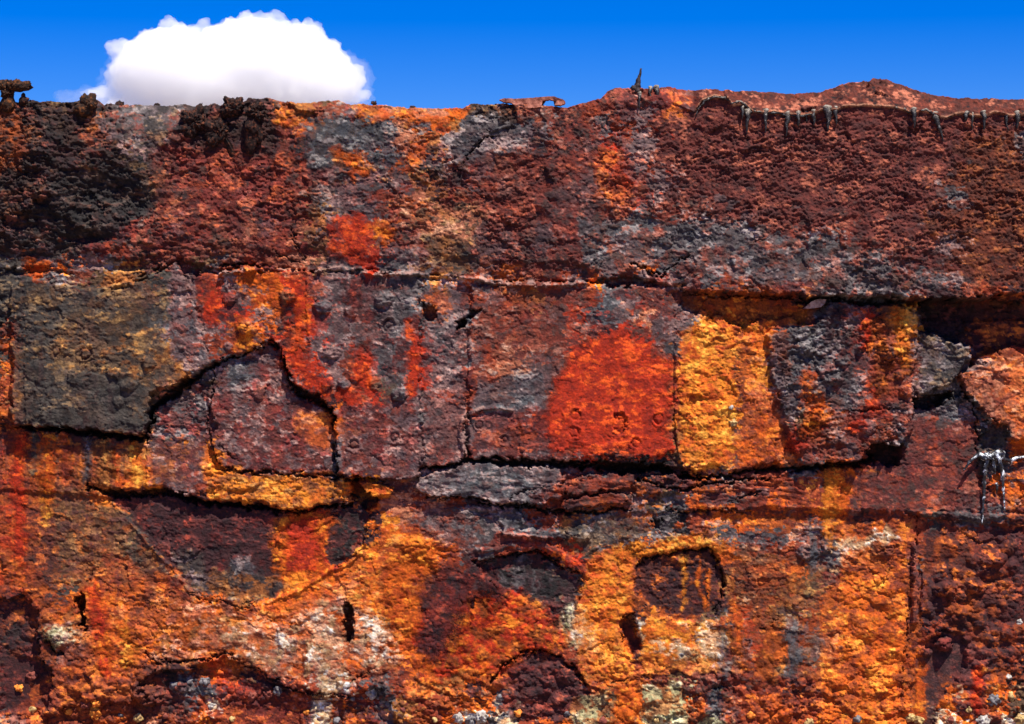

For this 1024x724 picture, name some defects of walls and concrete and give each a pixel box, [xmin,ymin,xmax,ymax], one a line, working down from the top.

corrosion [10,430,145,565]
crack [11,338,387,518]
spalling [0,594,400,724]
corrosion [269,508,337,587]
corrosion [238,268,372,402]
corrosion [405,318,420,399]
corrosion [380,527,570,691]
corrosion [542,329,674,455]
crack [417,411,878,519]
corrosion [612,532,727,610]
corrosion [822,465,850,548]
corrosion [848,305,912,433]